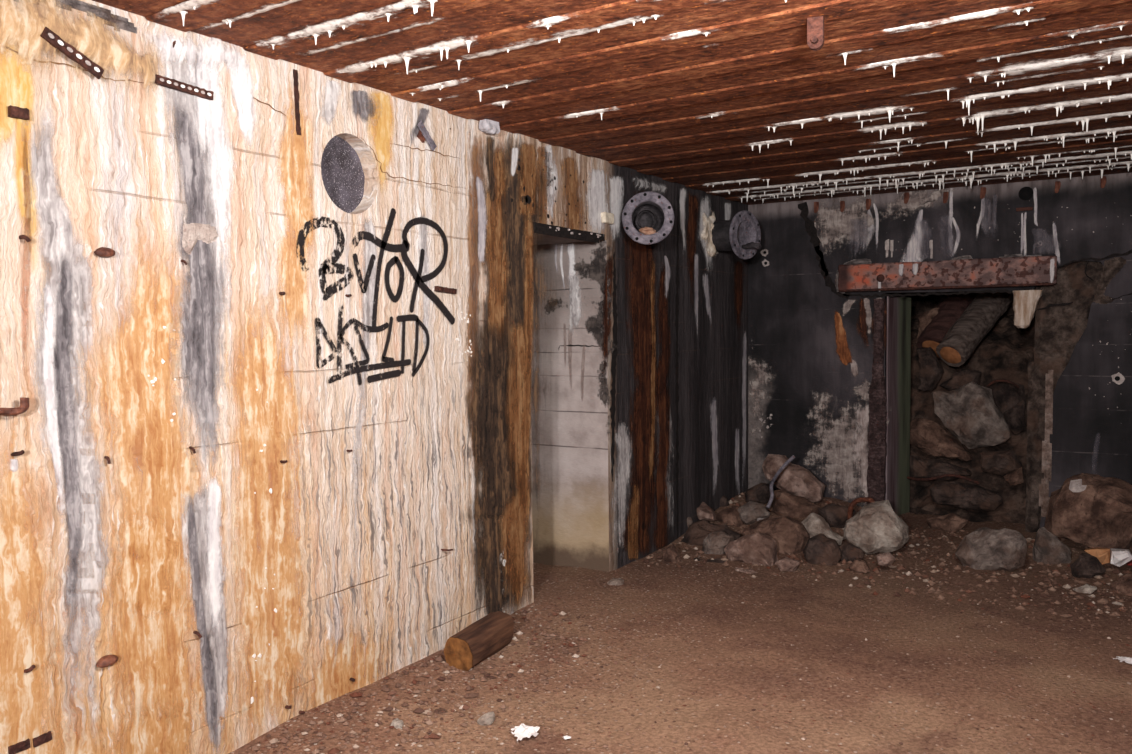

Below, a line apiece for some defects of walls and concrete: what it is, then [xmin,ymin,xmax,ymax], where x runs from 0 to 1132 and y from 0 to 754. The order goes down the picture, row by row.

corrosion [0,44,35,331]
water stain [29,120,108,685]
corrosion [0,250,203,754]
water stain [165,53,256,455]
corrosion [225,98,384,725]
water stain [255,0,440,54]
water stain [322,15,660,124]
water stain [468,133,581,614]
water stain [694,25,1132,327]
crack [798,202,1030,299]
water stain [884,7,1039,32]
crack [1058,249,1132,281]